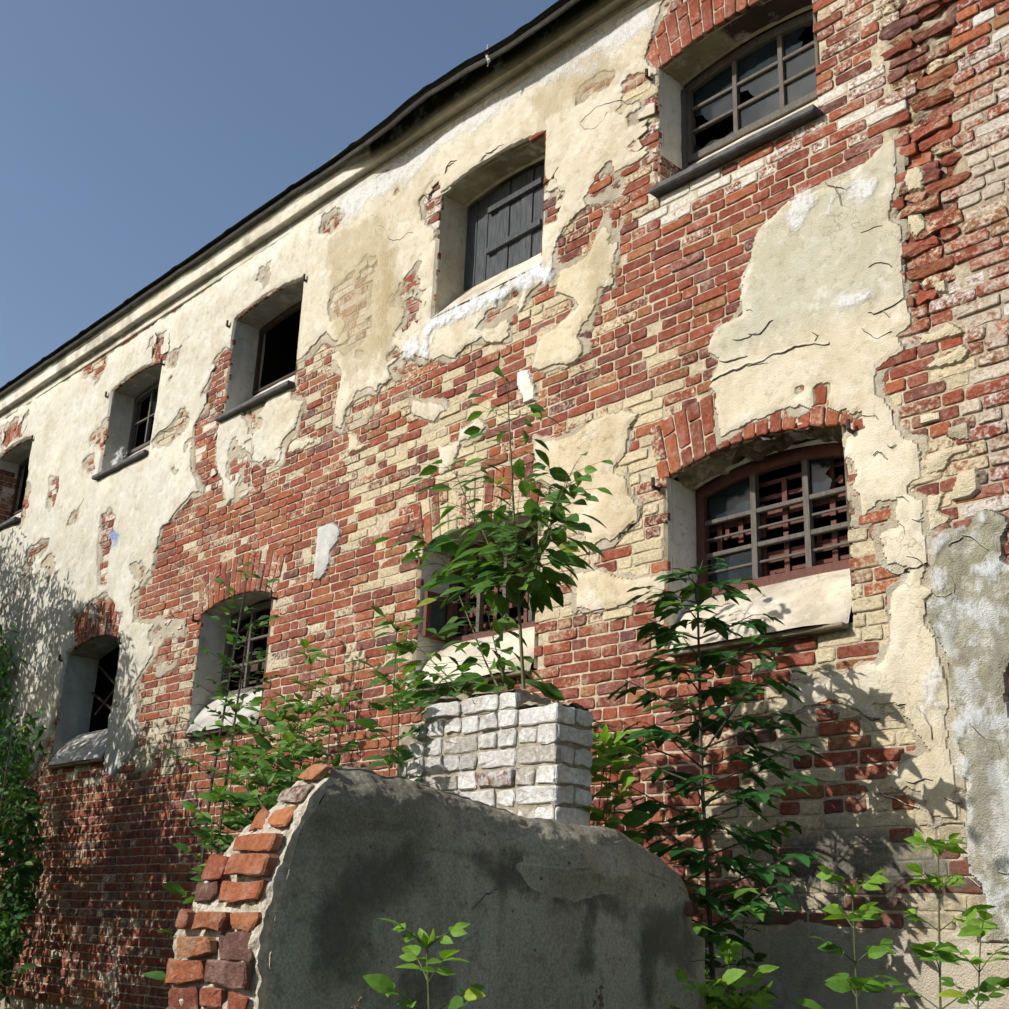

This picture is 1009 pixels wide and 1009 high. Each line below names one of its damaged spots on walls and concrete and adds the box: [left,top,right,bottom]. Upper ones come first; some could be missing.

peeling [646,0,766,70]
crack [825,182,856,205]
damp [403,261,552,357]
crack [711,309,829,383]
crack [862,297,904,339]
peeling [505,480,553,517]
crack [887,496,929,575]
peeling [67,511,122,655]
damp [939,599,977,619]
peeling [645,670,699,734]
crack [856,703,932,739]
peeling [590,741,704,860]